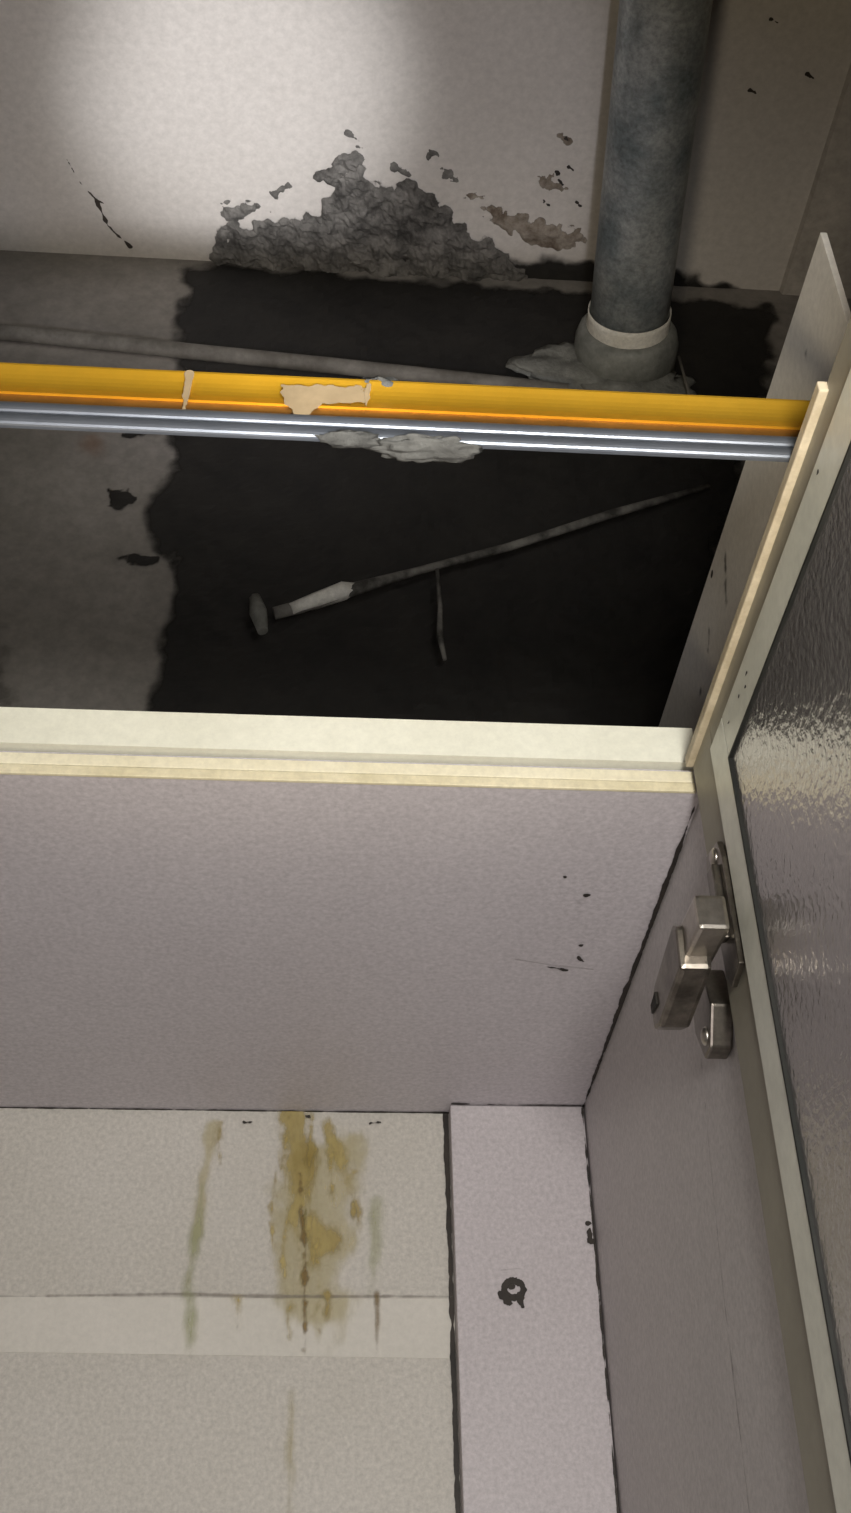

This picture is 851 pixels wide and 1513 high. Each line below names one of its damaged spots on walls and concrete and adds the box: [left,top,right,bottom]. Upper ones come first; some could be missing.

spalling [209,129,587,282]
leakage [271,1111,348,1332]
leakage [351,1200,361,1218]